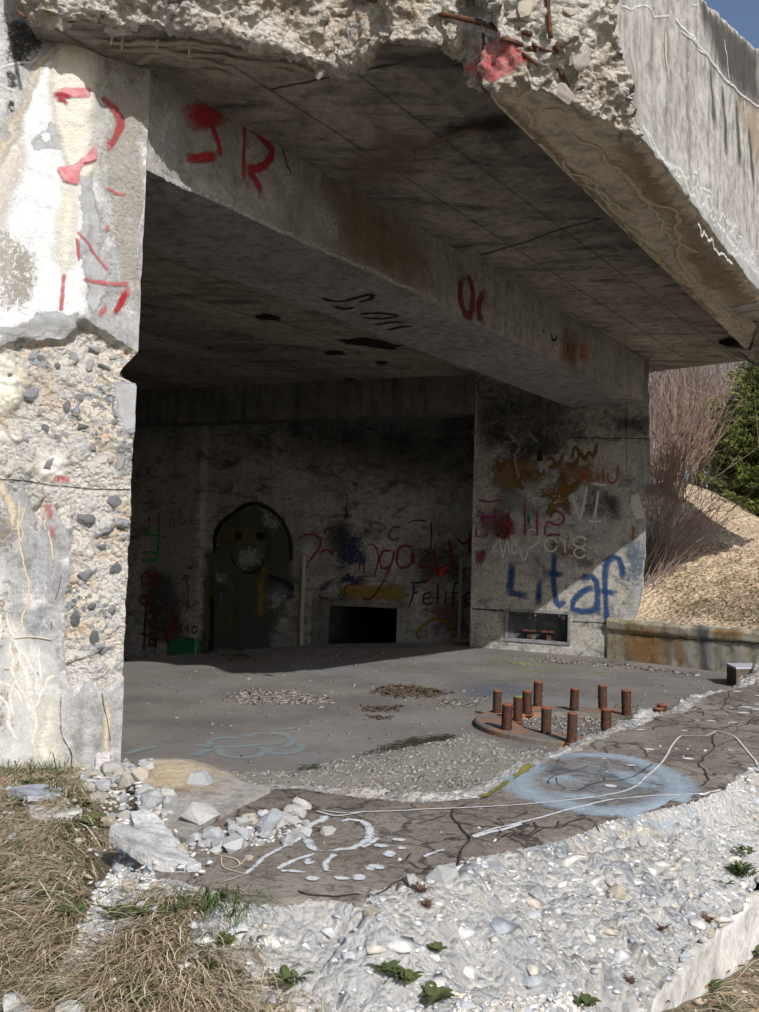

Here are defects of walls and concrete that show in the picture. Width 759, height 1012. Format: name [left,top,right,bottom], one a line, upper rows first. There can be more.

crack [271,76,336,90]
spalling [15,0,645,151]
damp [702,2,758,181]
crack [643,126,759,279]
spalling [0,83,148,692]
crack [0,479,130,631]
corrosion [627,630,664,663]
crack [59,693,72,767]
spalling [94,751,111,770]
crack [548,690,759,802]
crack [298,853,424,897]
crack [422,809,600,866]